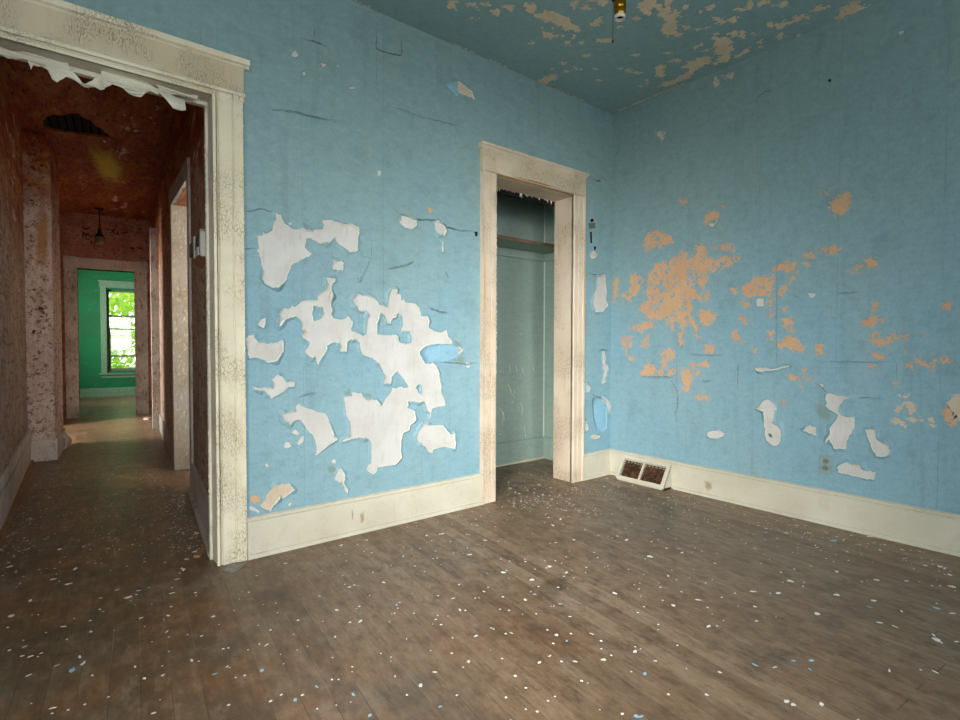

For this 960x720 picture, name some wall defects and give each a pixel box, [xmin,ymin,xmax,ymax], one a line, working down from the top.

flaking render [43,114,108,143]
peeling [0,46,209,127]
peeling [445,0,623,102]
peeling [618,0,870,111]
peeling [244,208,470,476]
peeling [590,230,740,402]
peeling [730,244,845,357]
peeling [859,302,953,374]
peeling [584,350,611,441]
peeling [755,397,789,447]
peeling [785,366,960,482]
peeling [248,481,298,513]